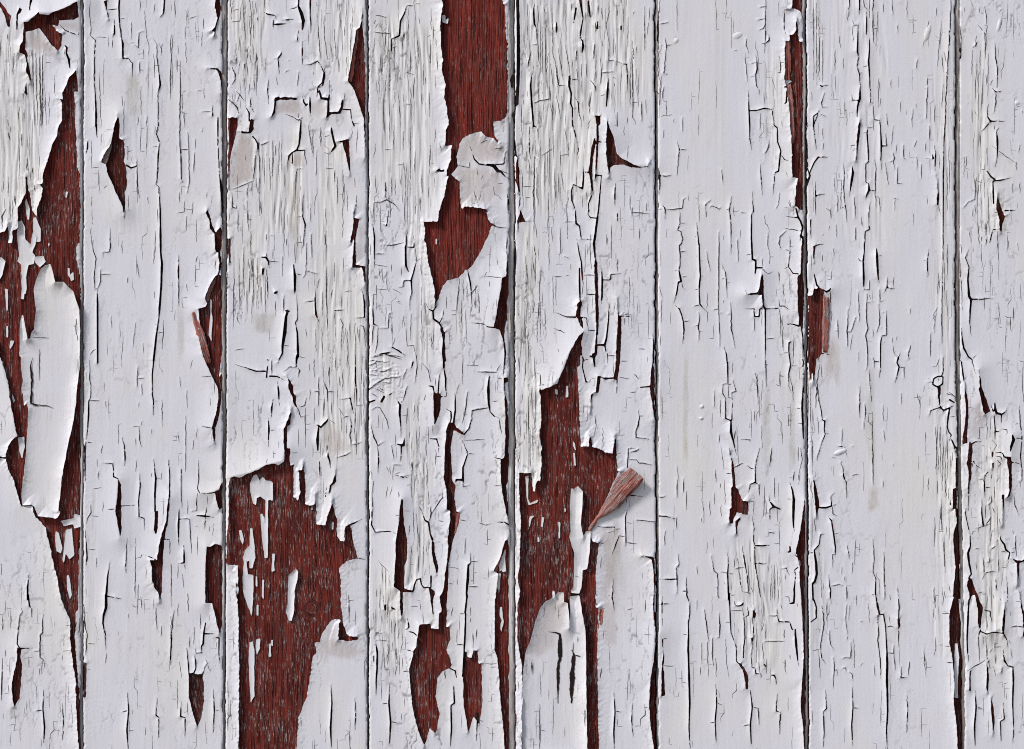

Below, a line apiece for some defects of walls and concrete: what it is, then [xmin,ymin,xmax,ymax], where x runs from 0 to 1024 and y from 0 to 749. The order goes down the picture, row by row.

crack [0,34,55,222]
peeling [0,71,81,749]
peeling [101,118,128,213]
crack [60,0,204,473]
crack [67,384,236,749]
peeling [205,379,358,749]
peeling [409,609,483,744]
peeling [424,0,508,305]
crack [203,0,910,749]
peeling [494,255,644,749]
peeling [784,0,803,211]
crack [804,0,1024,738]